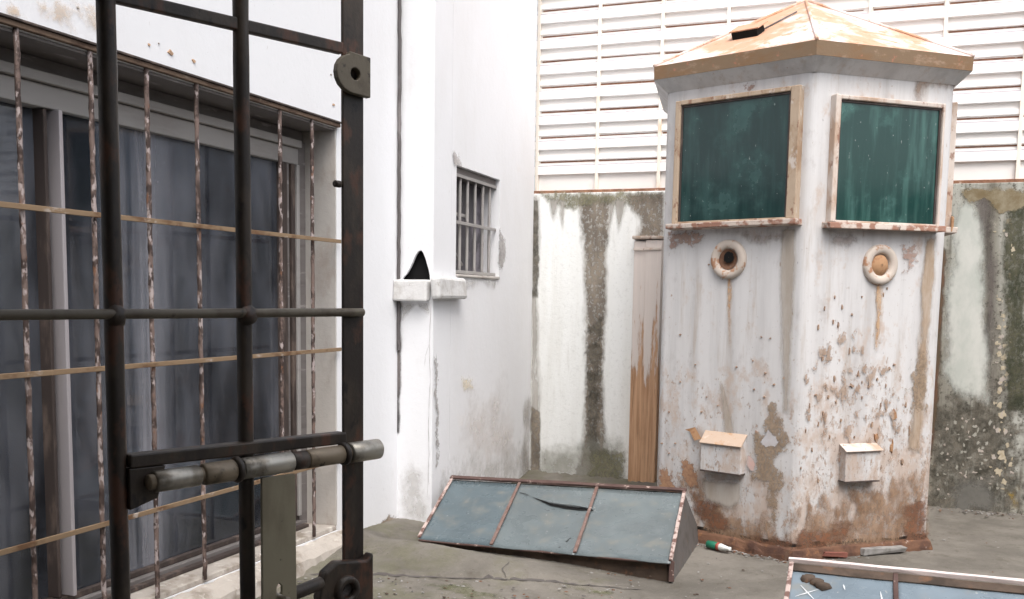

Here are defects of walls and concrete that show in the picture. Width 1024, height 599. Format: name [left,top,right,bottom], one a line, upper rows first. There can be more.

damp [530,196,625,479]
peeling [746,388,791,527]
rust [681,472,929,549]
damp [927,188,1024,514]